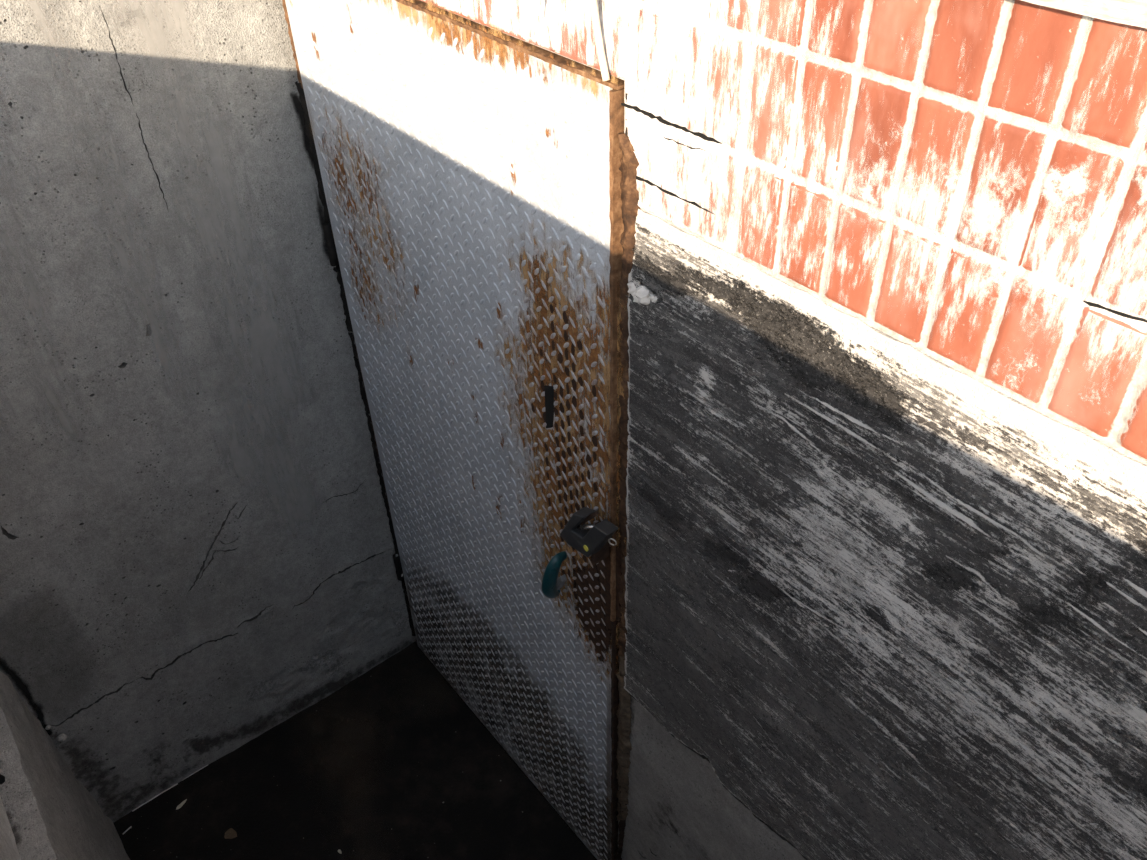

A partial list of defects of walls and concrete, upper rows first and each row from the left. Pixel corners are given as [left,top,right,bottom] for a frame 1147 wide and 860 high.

crack [99,5,168,209]
corrosion [319,109,419,325]
corrosion [377,0,598,98]
crack [621,103,722,151]
crack [636,176,715,215]
crack [1083,301,1147,323]
corrosion [476,238,631,680]
crack [50,551,385,726]